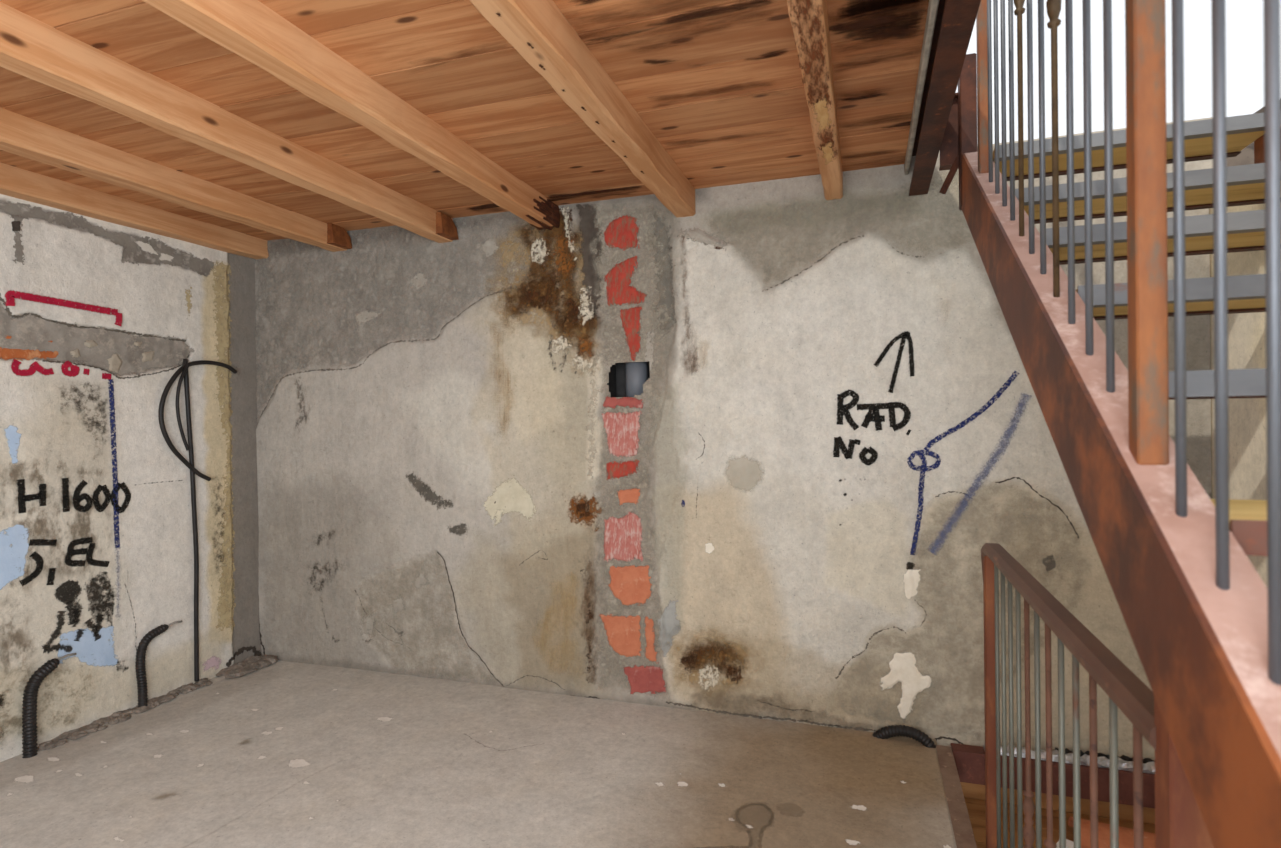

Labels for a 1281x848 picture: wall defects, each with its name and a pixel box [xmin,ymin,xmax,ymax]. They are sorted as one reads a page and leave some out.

water stain [578,0,772,64]
water stain [748,0,927,108]
water stain [817,114,911,165]
rust [498,207,597,376]
spalling [0,202,236,631]
water stain [10,466,42,484]
water stain [23,501,94,547]
rust [568,495,602,531]
water stain [72,562,114,626]
water stain [2,632,27,662]
peeling [57,626,117,667]
rust [676,637,748,692]